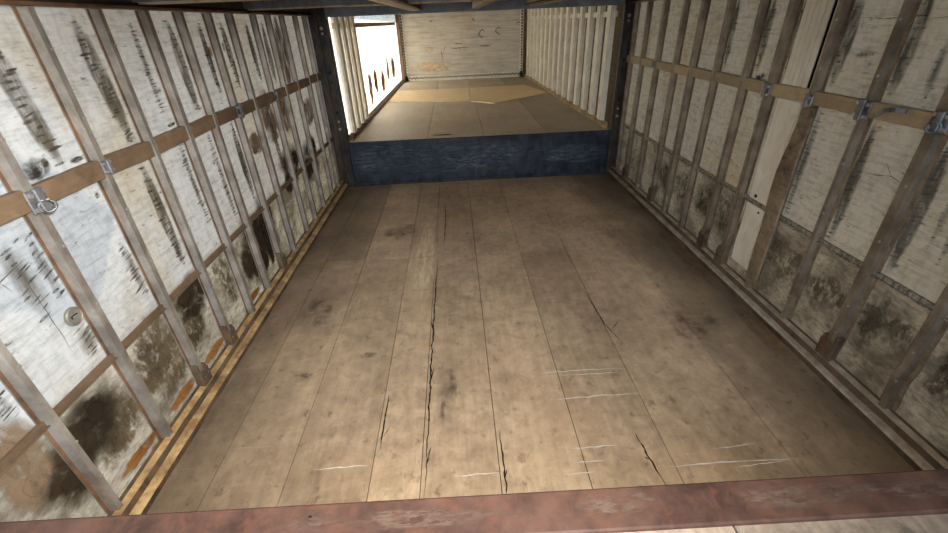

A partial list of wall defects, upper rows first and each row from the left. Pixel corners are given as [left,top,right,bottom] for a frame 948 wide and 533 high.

damp [0,51,83,179]
damp [179,143,211,222]
damp [231,92,319,282]
damp [134,318,186,394]
mould [177,278,205,350]
damp [213,260,237,299]
crack [424,209,446,492]
mould [858,300,914,345]
damp [0,390,90,509]
mould [67,392,139,466]
crack [635,433,666,485]